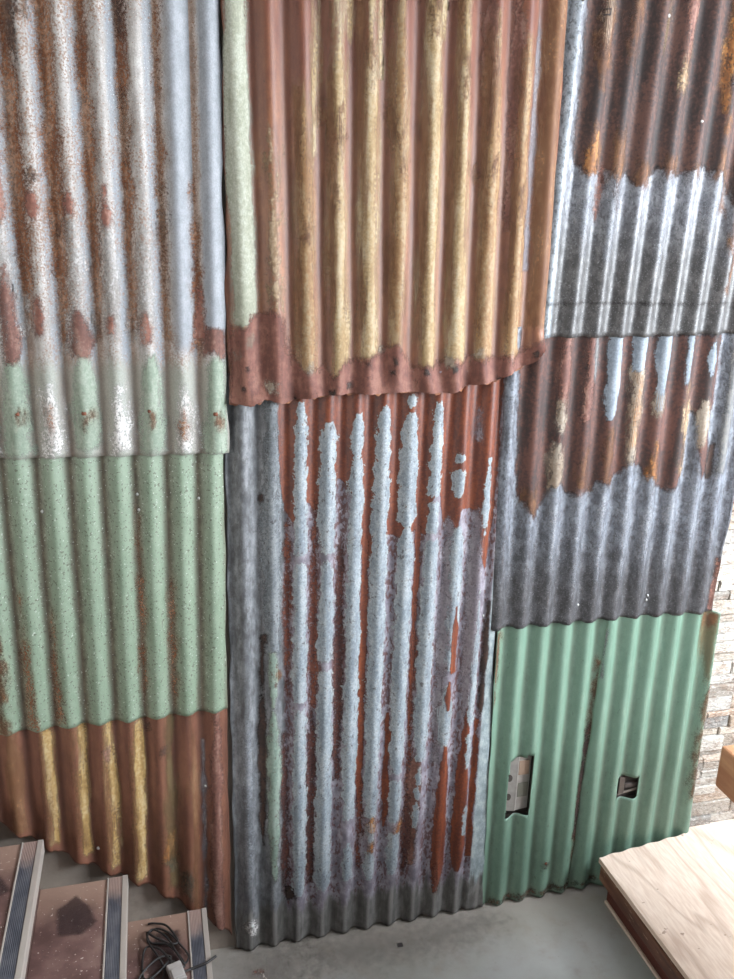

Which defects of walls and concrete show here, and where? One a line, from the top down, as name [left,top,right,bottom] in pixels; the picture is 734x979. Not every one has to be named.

rust [0,0,172,366]
rust [480,0,528,231]
rust [572,0,734,261]
rust [110,385,140,456]
rust [187,178,722,582]
rust [237,637,268,879]
rust [280,731,296,900]
rust [305,710,317,884]
rust [331,545,346,781]
peeling [257,375,504,897]
rust [404,631,419,814]
rust [478,600,502,717]